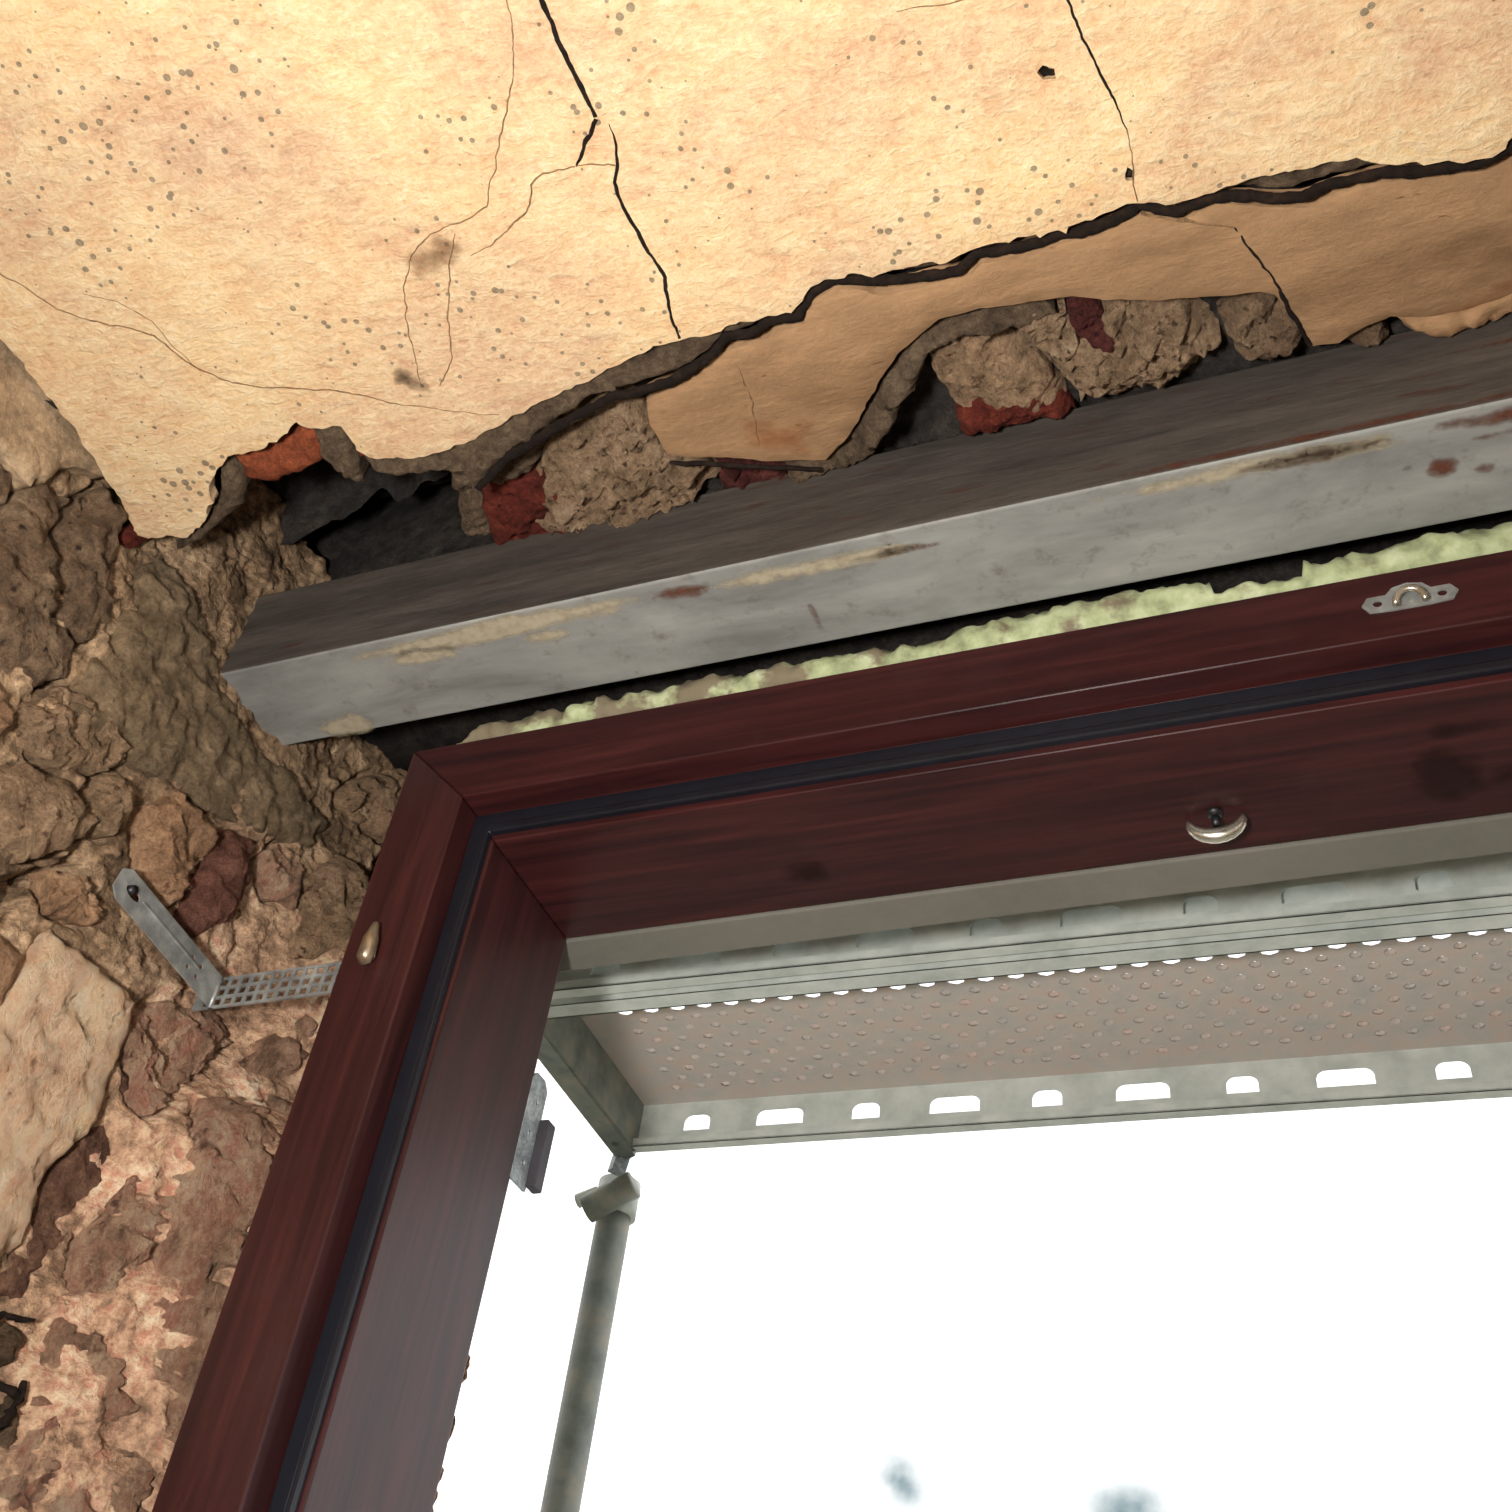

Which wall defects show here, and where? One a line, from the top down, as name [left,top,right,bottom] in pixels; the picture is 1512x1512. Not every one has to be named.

crack [0,0,1512,491]
spalling [175,151,1512,549]
spalling [0,339,407,1512]
crack [0,1380,27,1429]
crack [0,1311,36,1323]